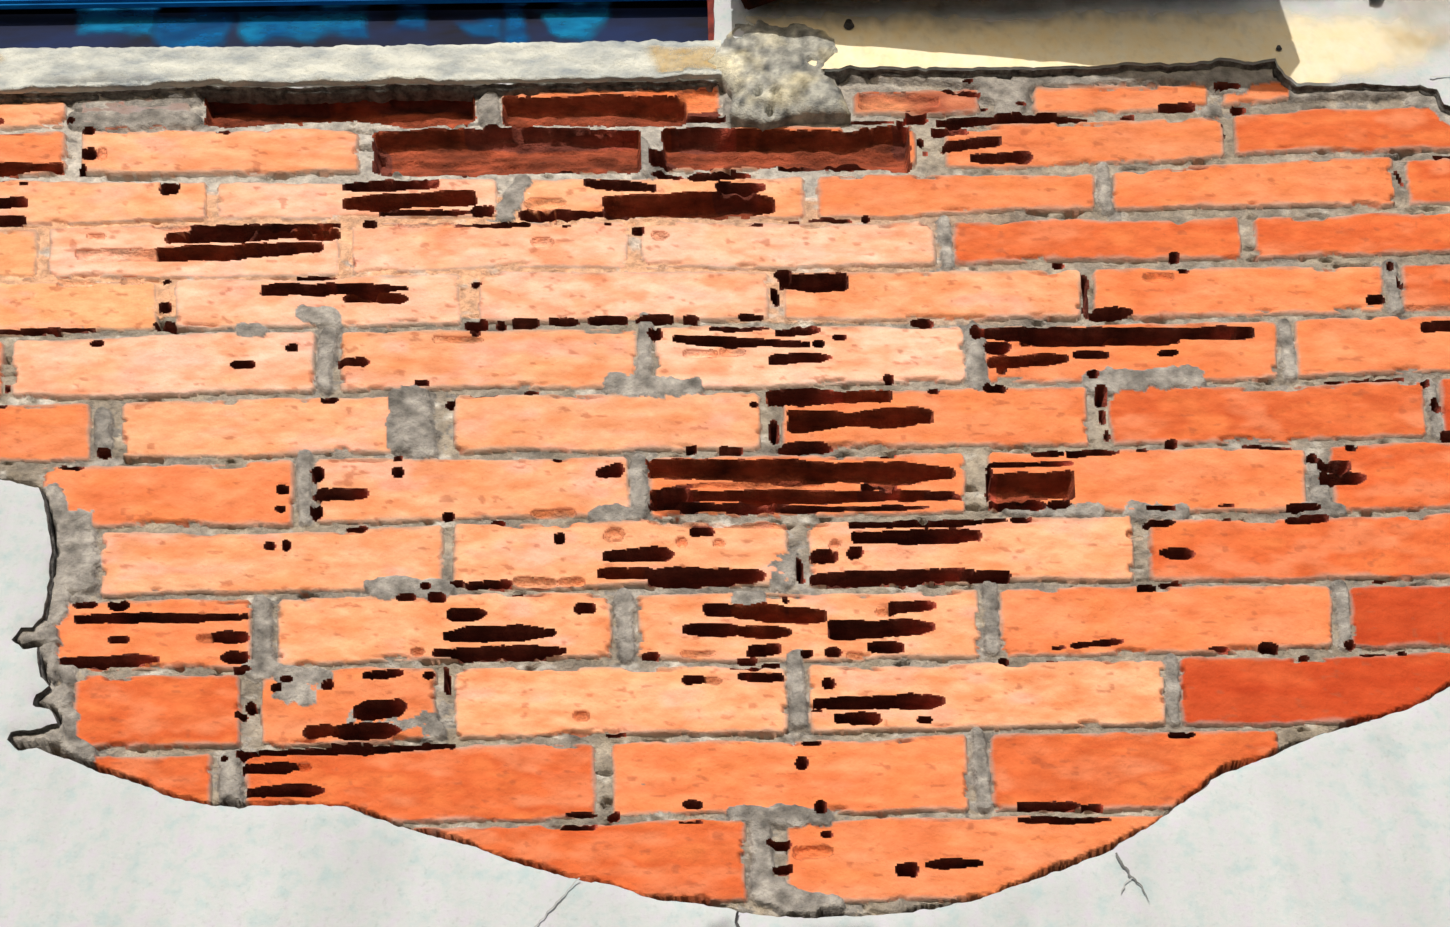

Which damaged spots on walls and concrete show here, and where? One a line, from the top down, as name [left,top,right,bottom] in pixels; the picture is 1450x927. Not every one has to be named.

spalling [969,324,1255,375]
spalling [984,461,1075,512]
spalling [849,518,1008,545]
spalling [597,566,767,589]
spalling [809,567,1012,590]
spalling [74,612,249,624]
spalling [443,623,557,643]
spalling [702,602,827,625]
spalling [827,618,936,641]
spalling [432,644,567,664]
spalling [811,692,946,712]
spalling [251,742,456,758]